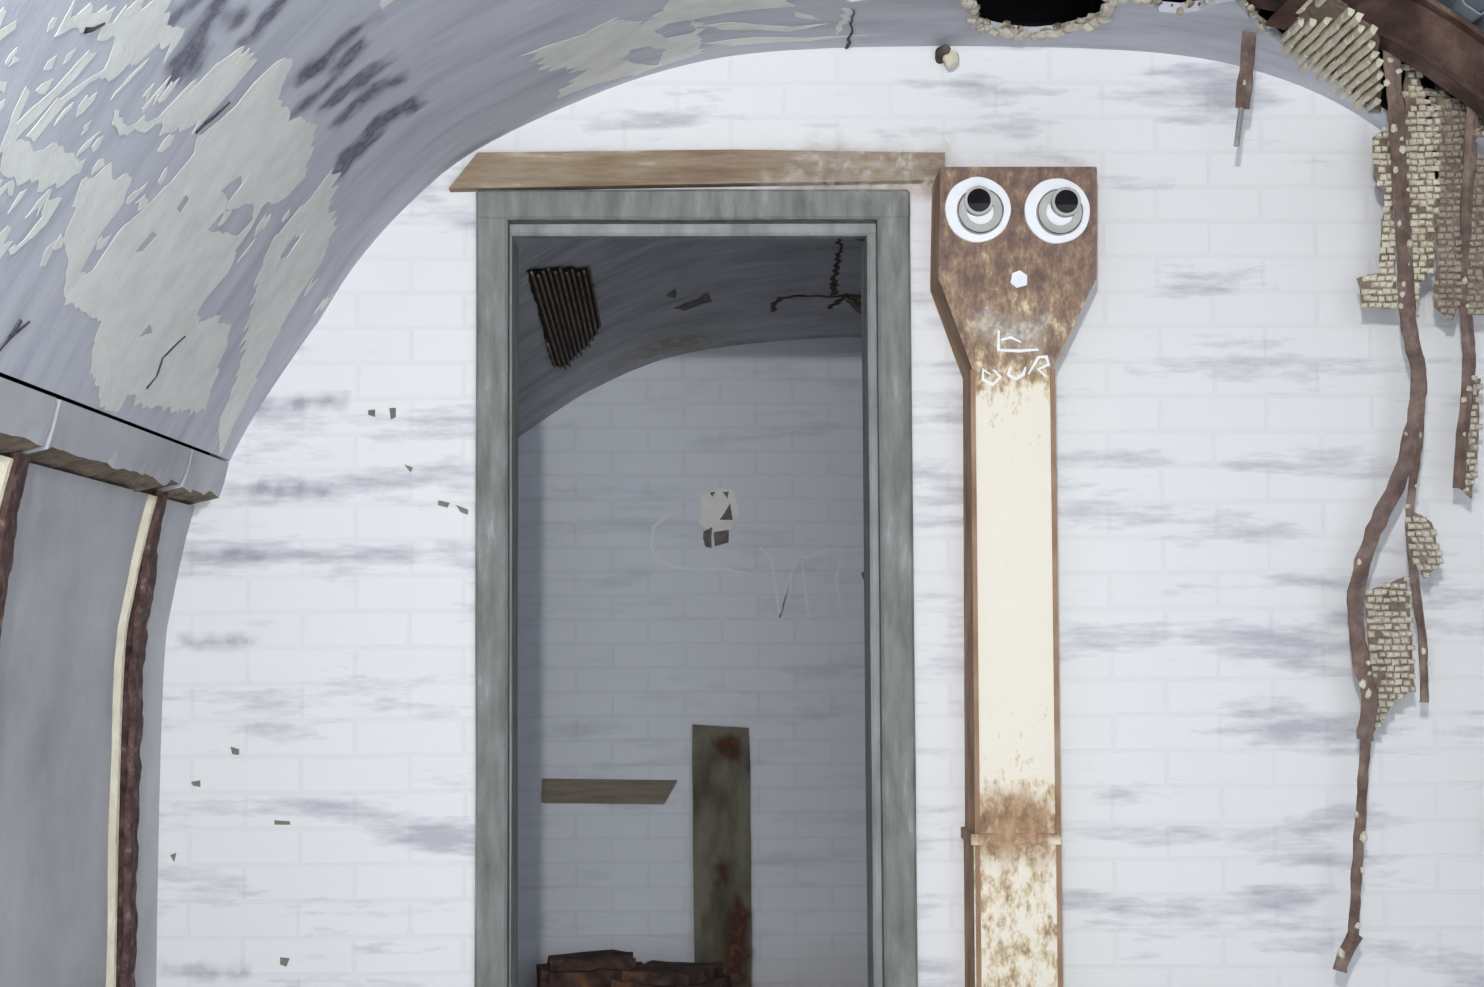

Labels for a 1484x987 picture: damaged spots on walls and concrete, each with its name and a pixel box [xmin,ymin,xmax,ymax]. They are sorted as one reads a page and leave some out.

flaking render [961,0,1212,42]
flaking render [1239,0,1282,39]
peeling [521,0,862,99]
peeling [0,0,342,455]
flaking render [666,289,712,311]
flaking render [368,408,396,419]